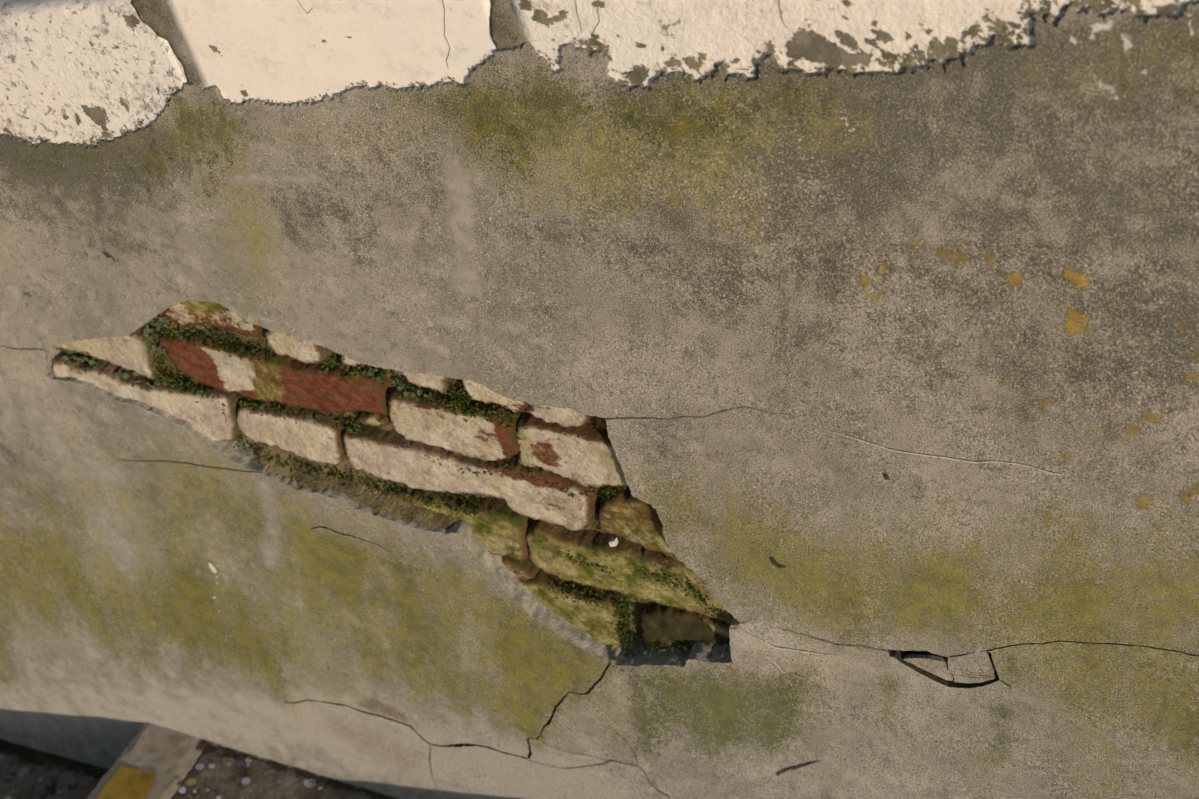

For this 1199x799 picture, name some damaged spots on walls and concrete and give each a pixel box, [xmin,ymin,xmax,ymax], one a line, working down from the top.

peeling [519,0,1199,87]
damp [257,479,287,569]
flaking render [44,301,804,675]
crack [734,621,888,673]
crack [528,656,670,799]